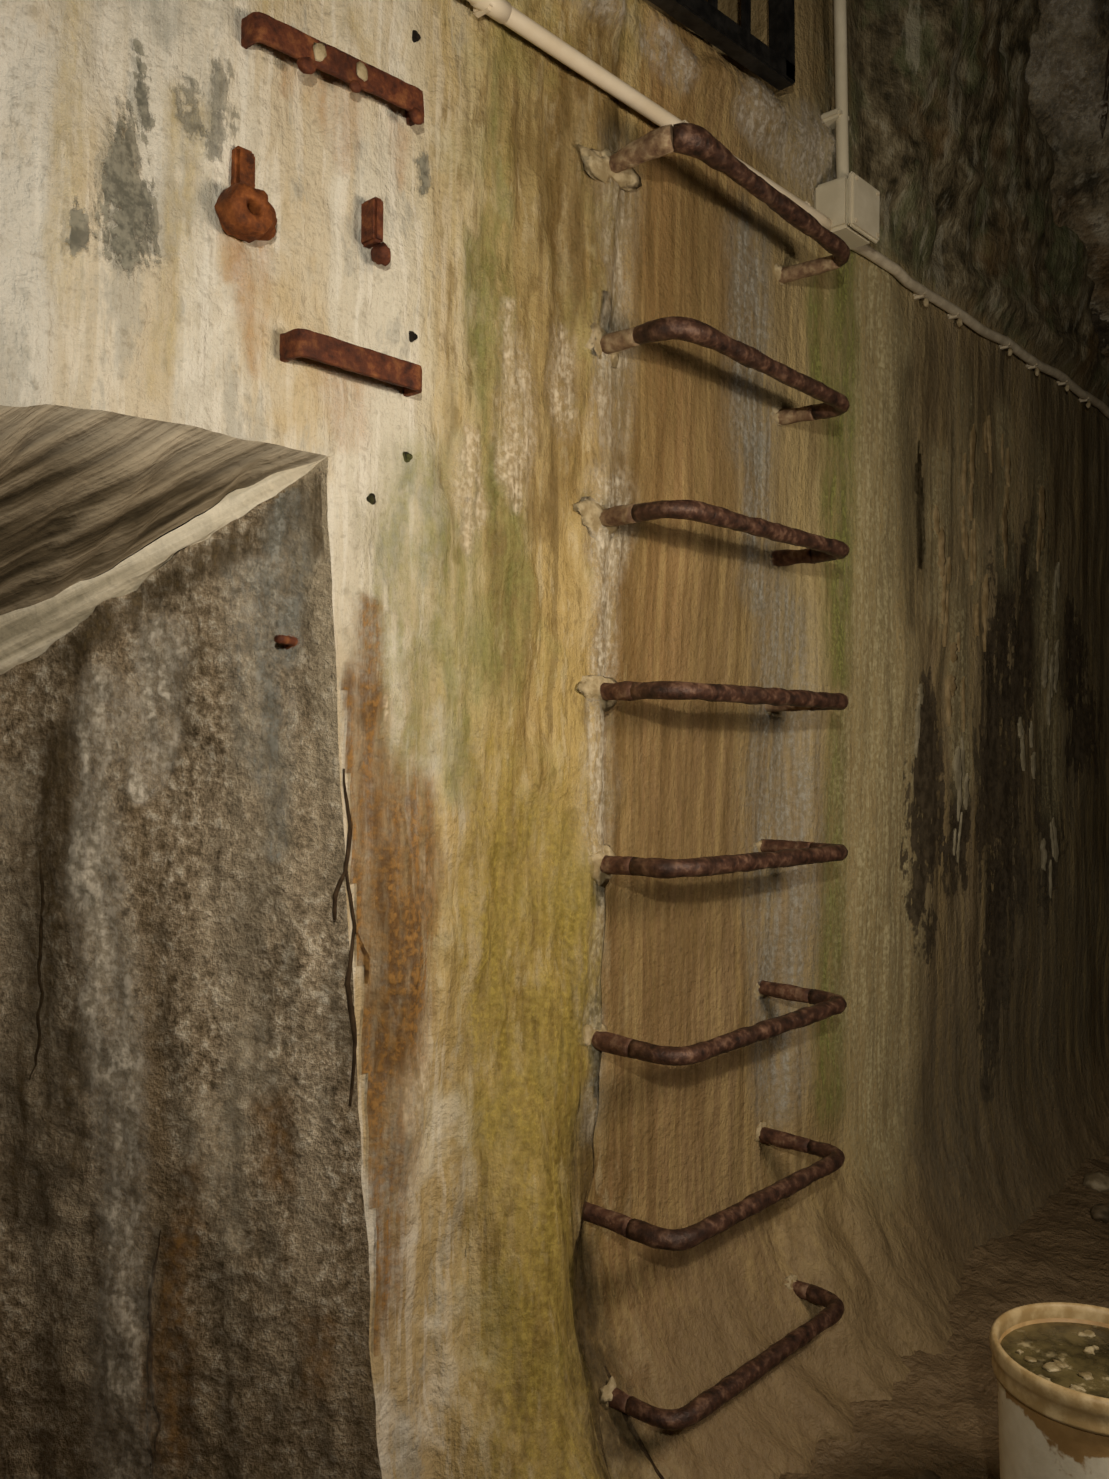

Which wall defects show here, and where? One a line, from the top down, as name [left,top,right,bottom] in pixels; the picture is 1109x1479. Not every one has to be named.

corrosion [296,57,317,74]
corrosion [409,107,424,125]
damp [414,152,431,195]
damp [601,178,632,333]
damp [498,301,532,512]
damp [553,332,573,420]
damp [457,427,485,552]
damp [596,526,622,675]
damp [589,711,604,854]
crack [332,769,369,1106]
corrosion [343,597,434,1355]
damp [562,888,644,1479]